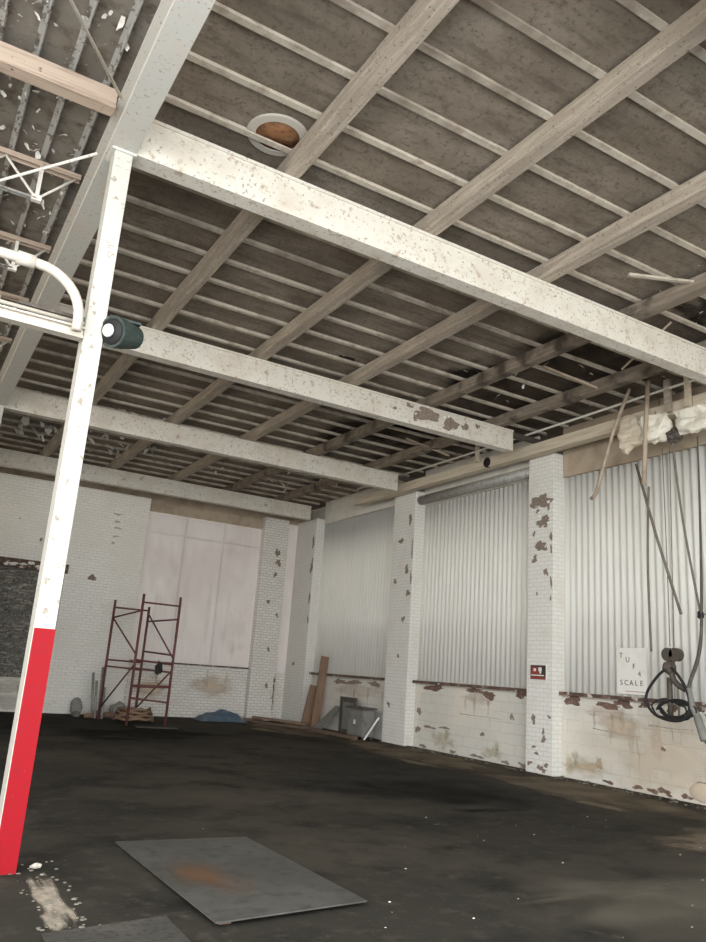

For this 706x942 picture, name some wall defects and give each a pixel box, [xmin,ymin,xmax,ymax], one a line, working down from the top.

peeling [101,10,125,30]
peeling [393,402,480,431]
peeling [530,492,553,601]
peeling [466,688,496,701]
peeling [564,696,581,706]
peeling [596,700,651,710]
spalling [415,708,450,748]
spalling [632,785,694,800]